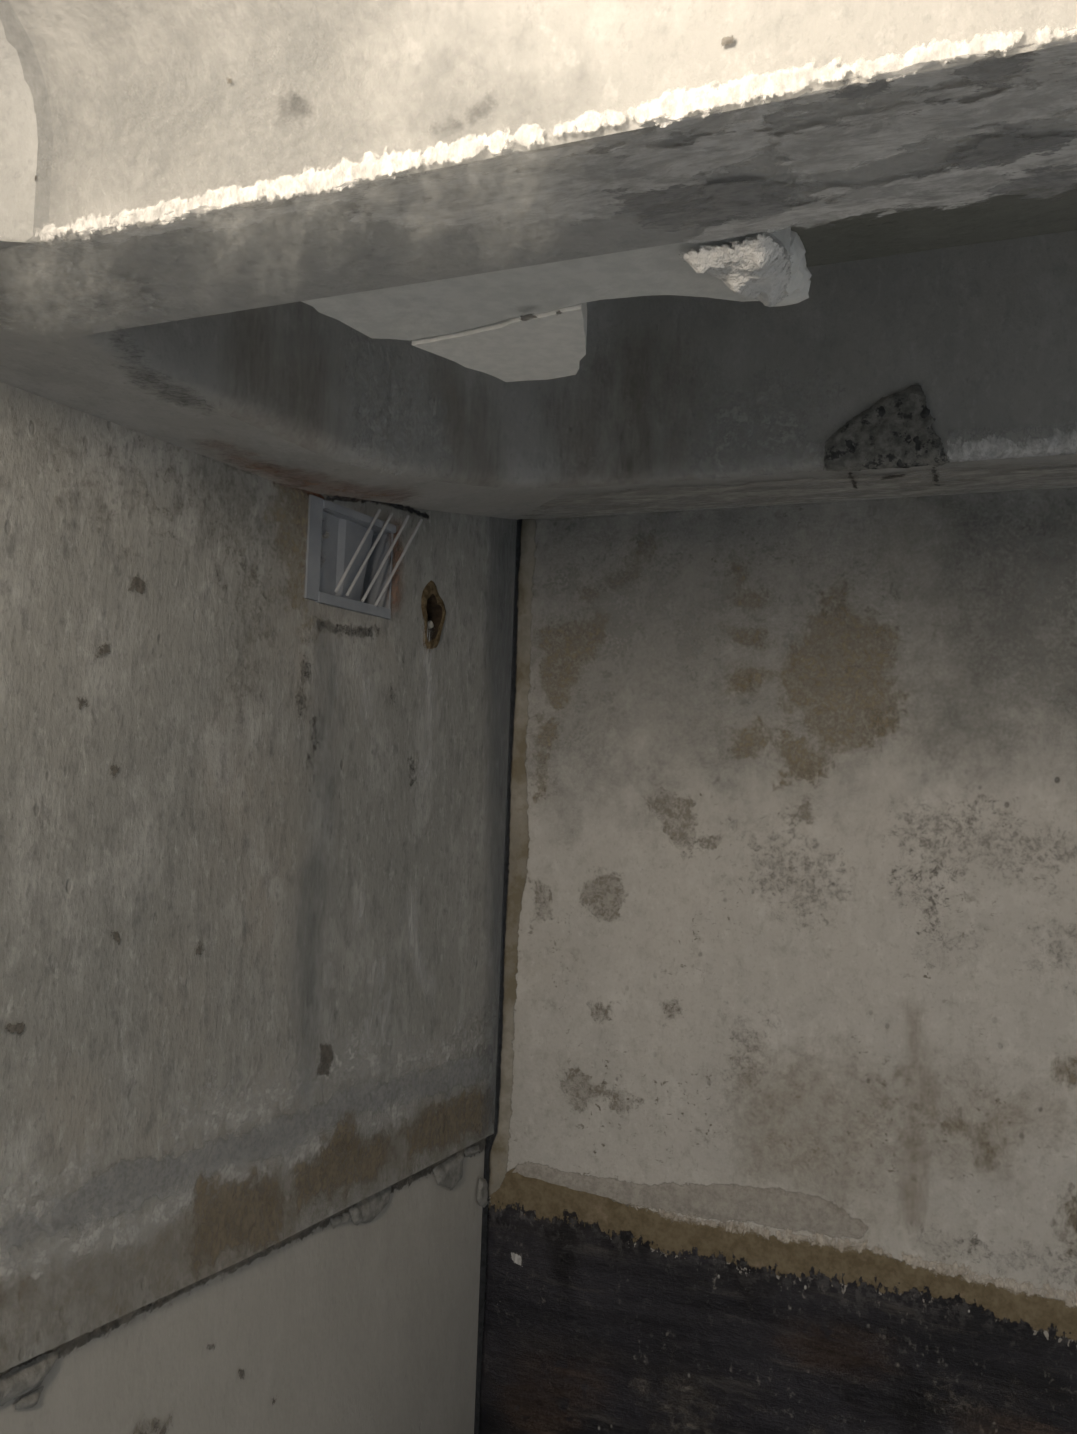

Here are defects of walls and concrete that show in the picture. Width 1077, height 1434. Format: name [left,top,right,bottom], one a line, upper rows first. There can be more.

water stain [2,7,1077,328]
spalling [824,385,949,472]
water stain [534,371,1077,764]
spalling [0,1347,61,1410]
water stain [0,1088,493,1336]
water stain [636,1206,1077,1307]